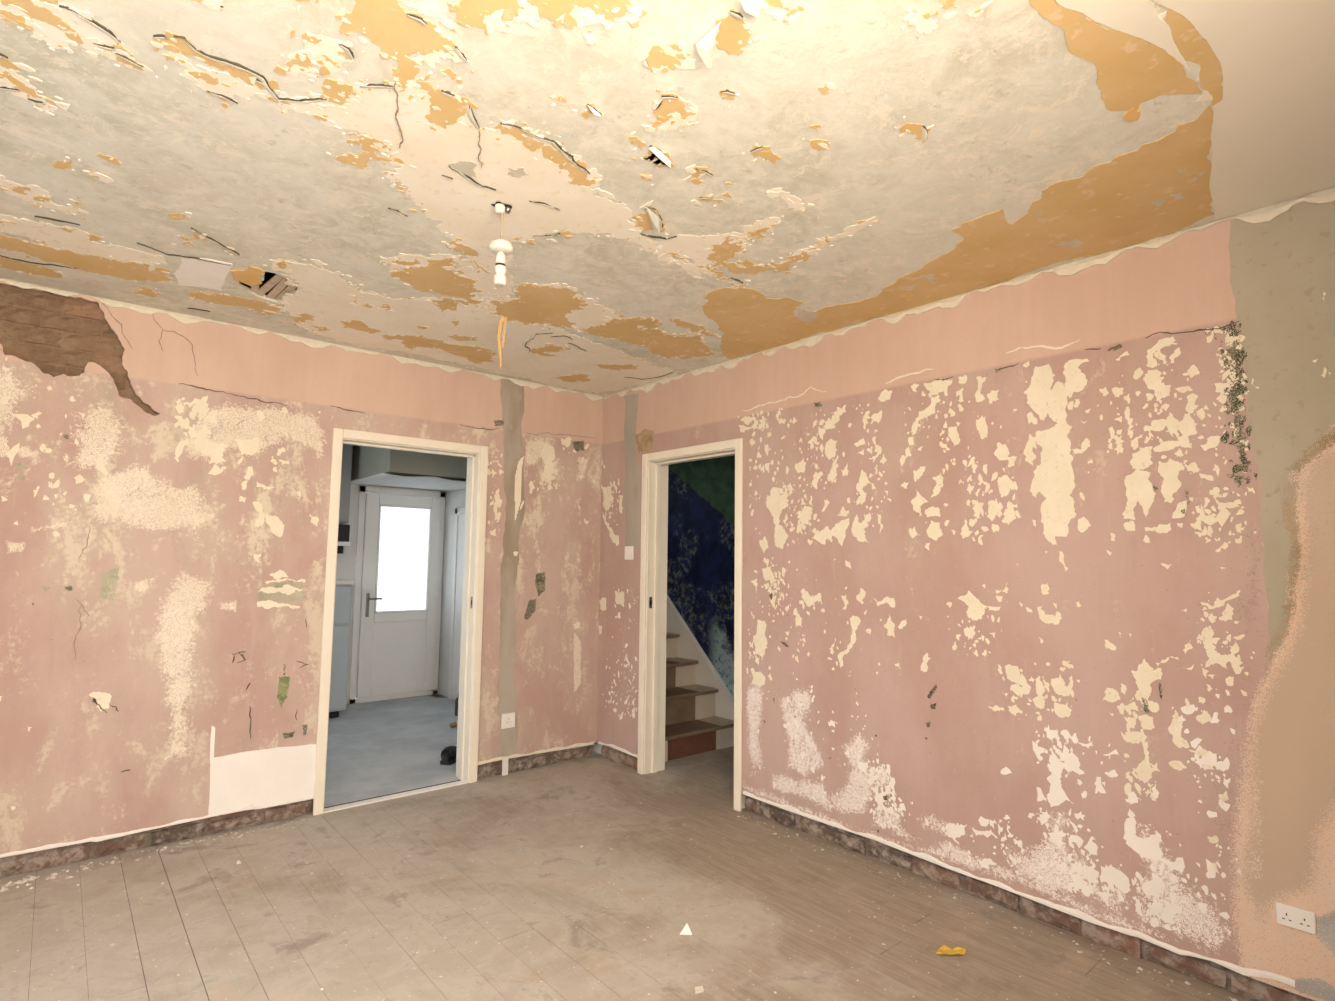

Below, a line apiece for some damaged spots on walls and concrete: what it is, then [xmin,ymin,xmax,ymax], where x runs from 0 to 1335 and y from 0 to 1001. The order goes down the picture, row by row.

peeling [0,0,1223,393]
peeling [485,449,504,541]
peeling [520,437,623,546]
peeling [89,691,112,711]
peeling [133,571,237,761]
peeling [573,622,581,693]
peeling [598,587,638,720]
flaking render [738,337,1335,1001]
flaking render [0,799,311,878]